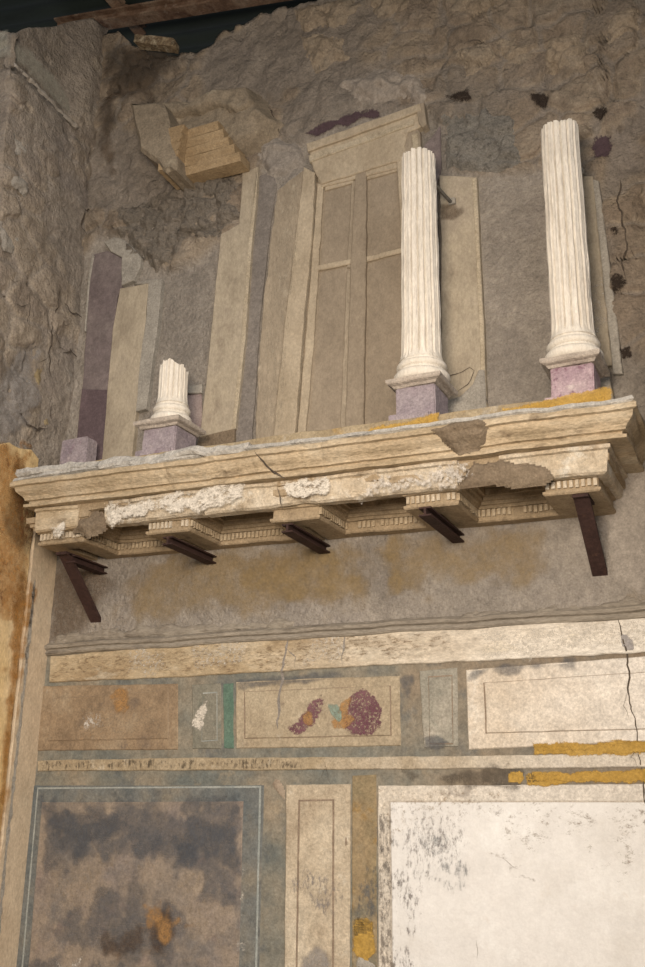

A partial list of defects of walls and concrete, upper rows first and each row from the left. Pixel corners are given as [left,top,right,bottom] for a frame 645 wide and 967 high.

peeling [105,484,245,527]
peeling [282,477,331,498]
damp [4,576,26,762]
crack [276,640,296,728]
crack [618,620,645,803]